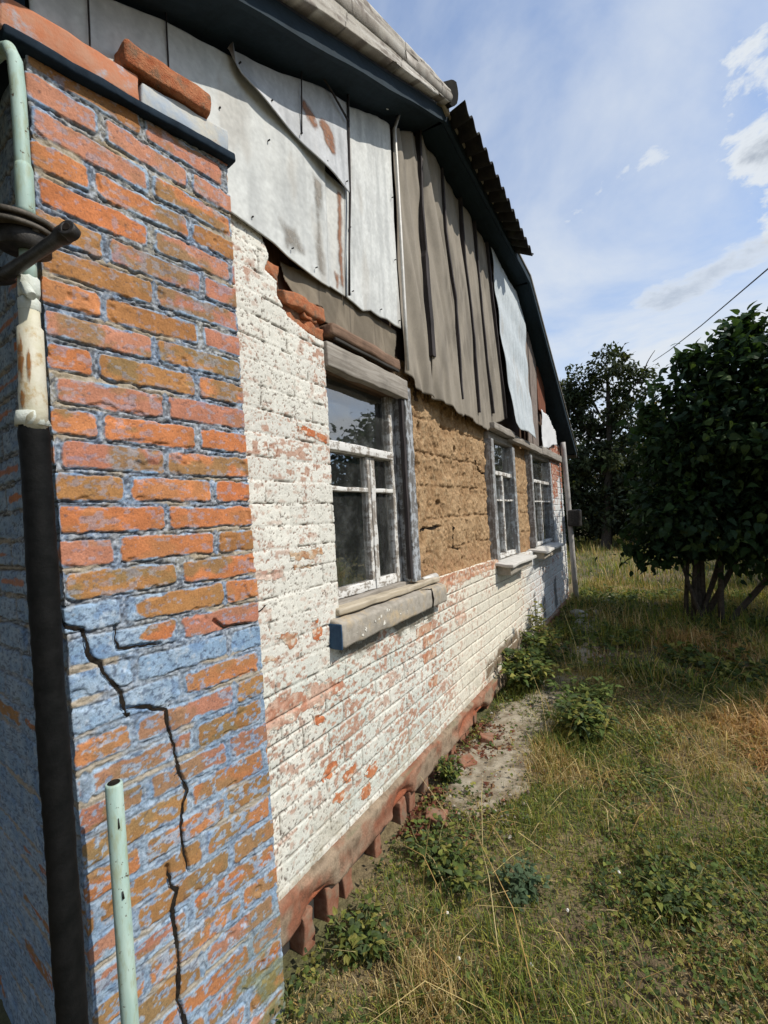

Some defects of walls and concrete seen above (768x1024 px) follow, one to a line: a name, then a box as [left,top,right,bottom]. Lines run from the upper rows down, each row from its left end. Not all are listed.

rust [302,100,335,153]
spalling [265,260,326,341]
peeling [297,422,327,444]
peeling [551,445,560,500]
peeling [255,547,323,581]
flaking render [437,558,498,592]
peeling [275,632,298,650]
peeling [312,616,324,641]
peeling [416,622,437,664]
peeling [265,677,344,736]
peeling [322,761,378,805]
crack [61,613,191,1024]